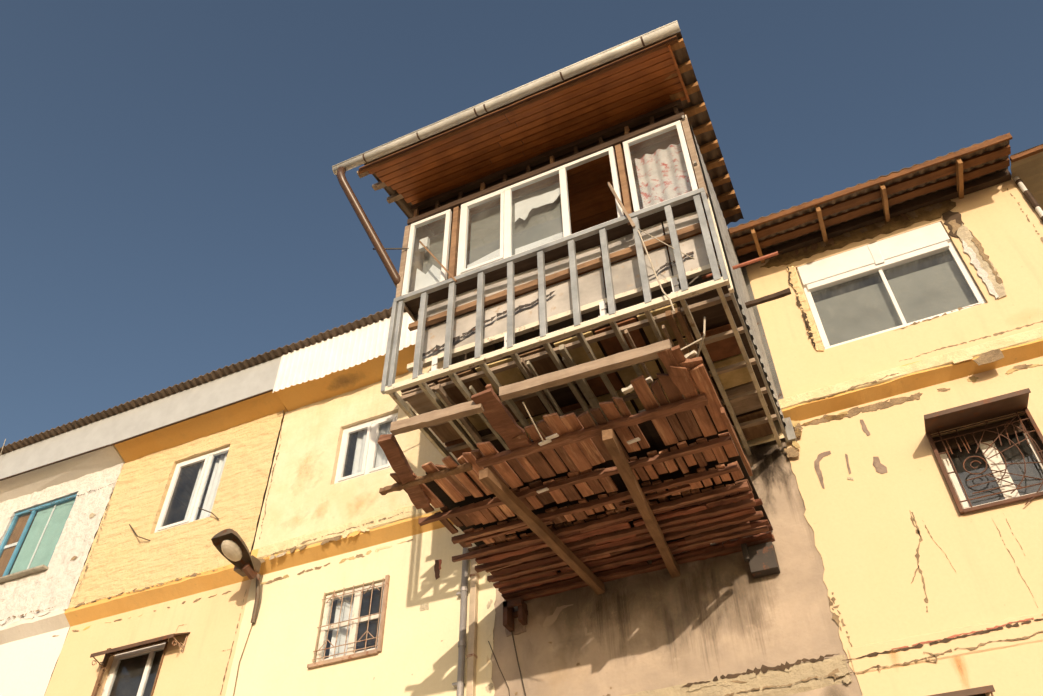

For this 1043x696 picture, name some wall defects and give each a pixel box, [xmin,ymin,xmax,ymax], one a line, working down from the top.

crack [787,267,816,348]
flaking render [761,200,1007,351]
flaking render [952,349,1043,382]
flaking render [784,392,923,458]
peeling [814,451,831,489]
peeling [873,457,887,474]
leakage [708,556,749,589]
crack [682,512,1043,696]